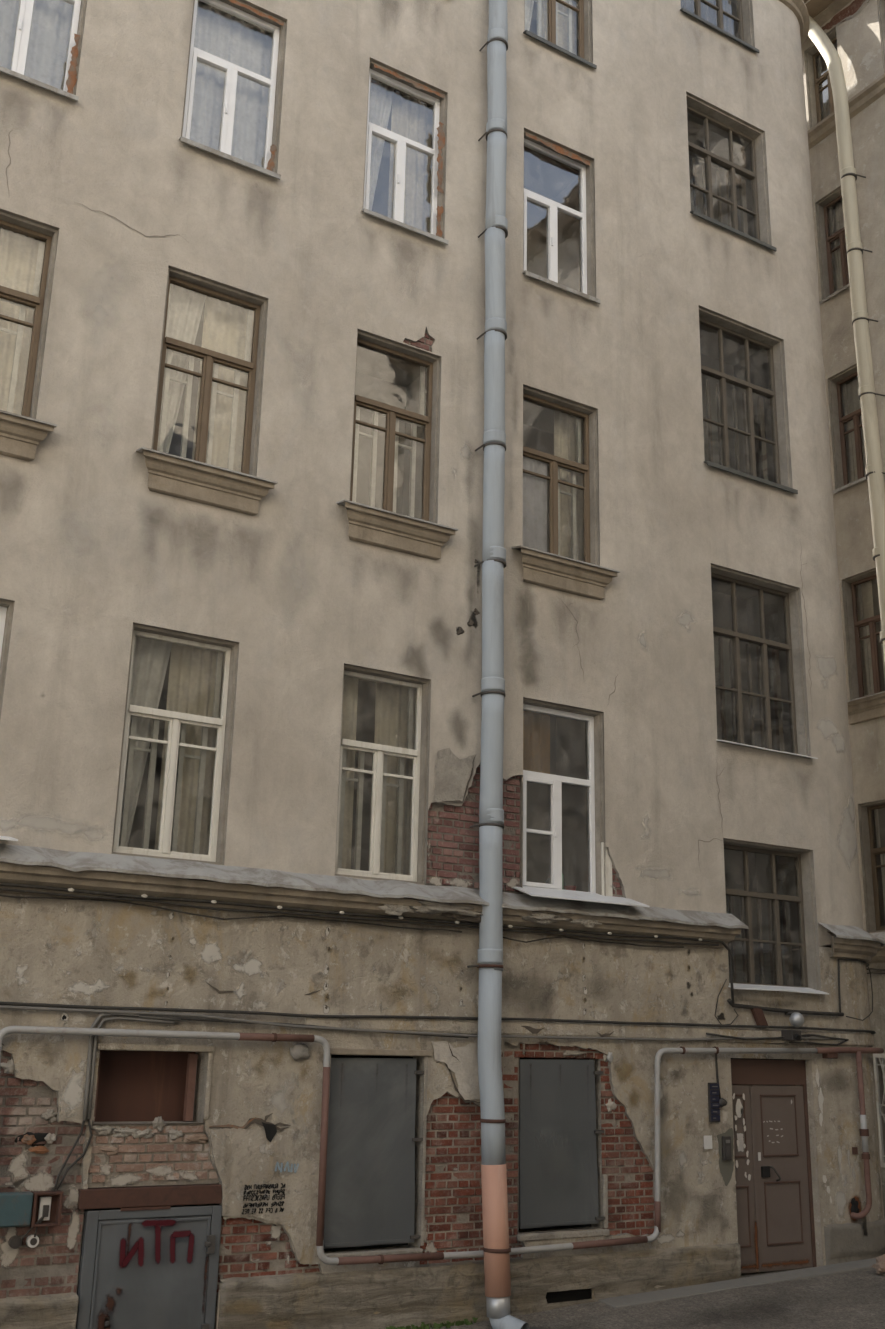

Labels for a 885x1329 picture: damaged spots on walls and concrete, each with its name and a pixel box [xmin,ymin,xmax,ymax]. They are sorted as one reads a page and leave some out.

crack [5,129,13,190]
crack [78,203,186,240]
flaking render [426,748,481,890]
flaking render [502,775,523,894]
peeling [189,938,263,998]
flaking render [0,1050,220,1298]
flaking render [417,1041,484,1265]
flaking render [217,1217,322,1292]